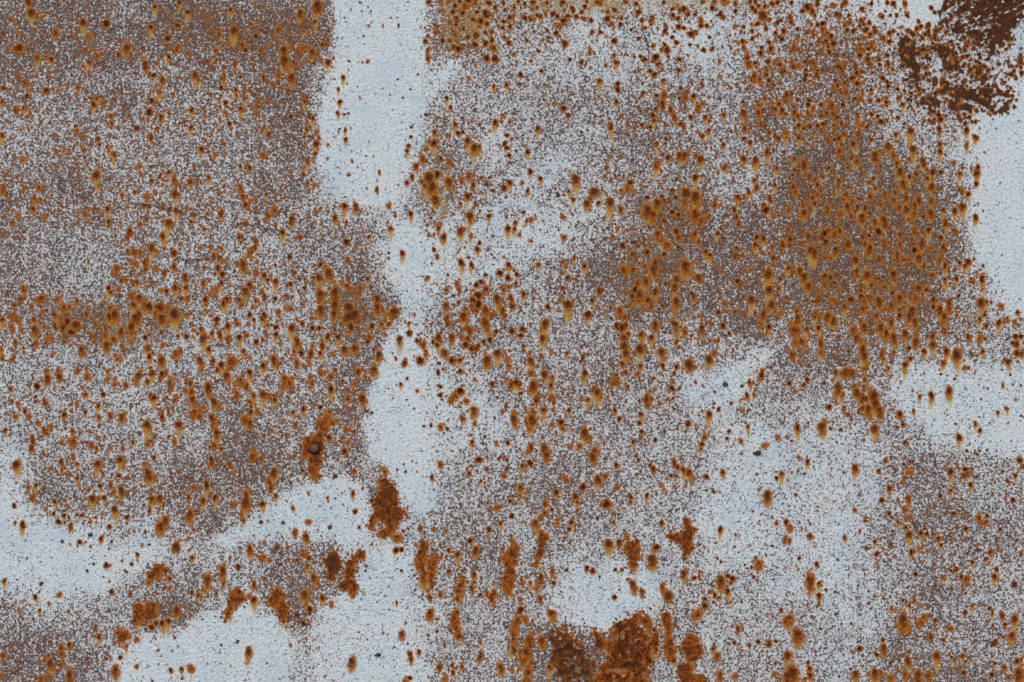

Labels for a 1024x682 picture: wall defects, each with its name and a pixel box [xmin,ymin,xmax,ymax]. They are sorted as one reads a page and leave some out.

rust [317,52,370,120]
rust [761,407,810,483]
rust [843,498,893,575]
rust [0,578,62,620]
rust [156,648,196,681]
rust [212,636,253,680]
rust [322,633,357,672]
rust [393,621,427,666]
rust [420,630,470,682]
rust [716,622,778,659]
rust [745,604,822,682]
rust [838,571,1024,682]